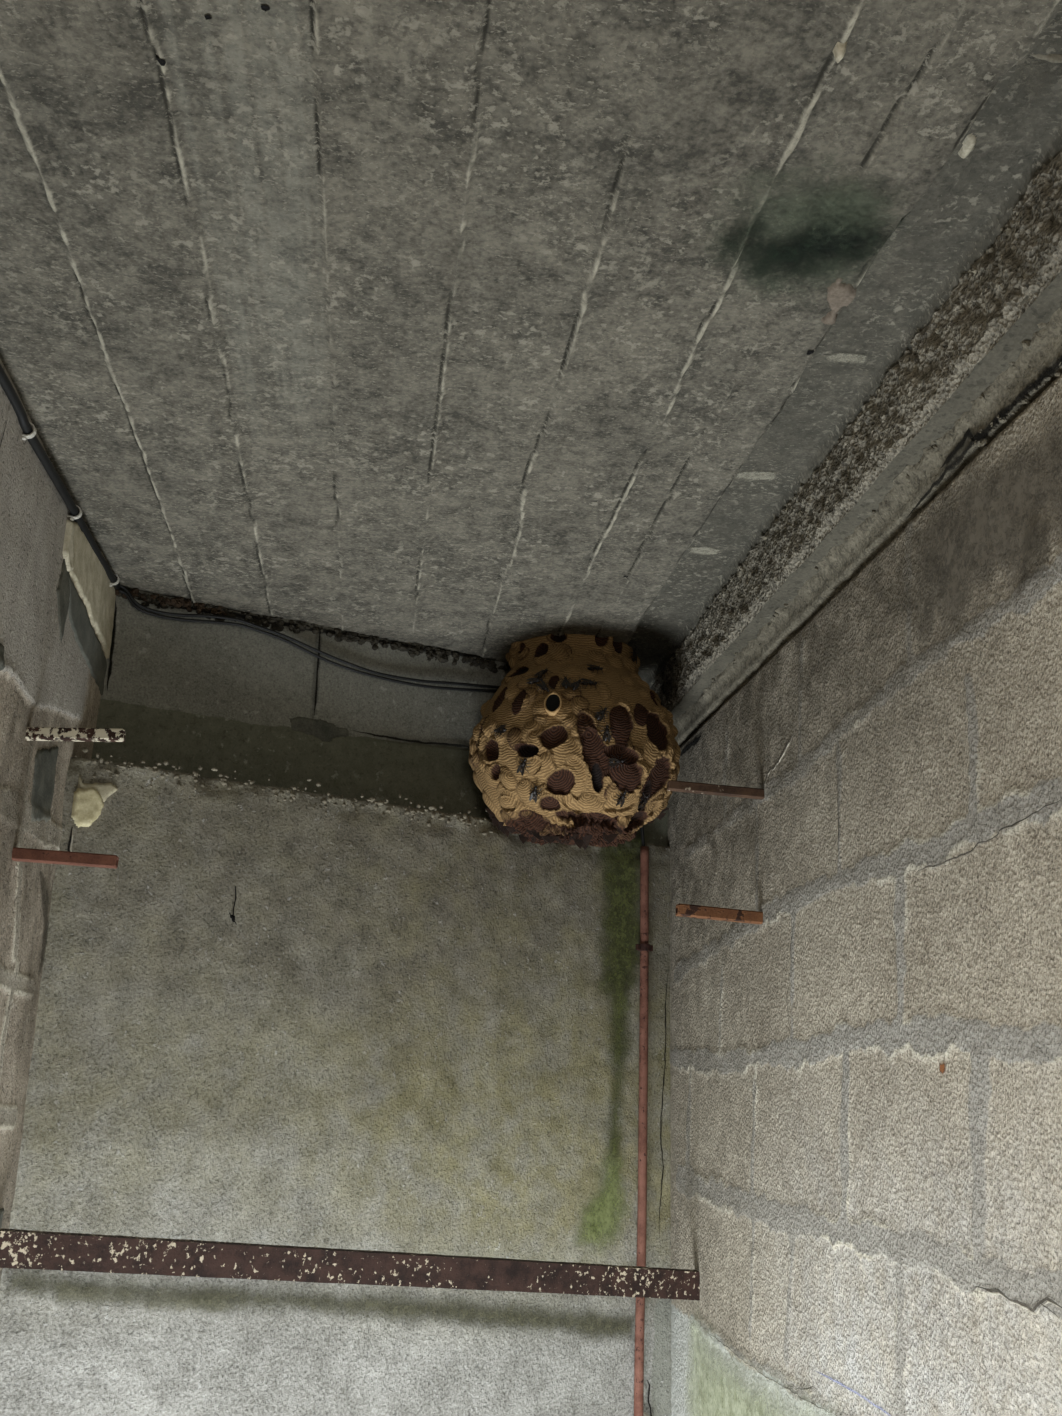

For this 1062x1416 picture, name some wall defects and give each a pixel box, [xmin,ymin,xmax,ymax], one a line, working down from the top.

damp [724,191,886,288]
damp [922,439,1062,632]
crack [910,800,1060,878]
damp [582,982,631,1243]
crack [976,1286,1062,1321]